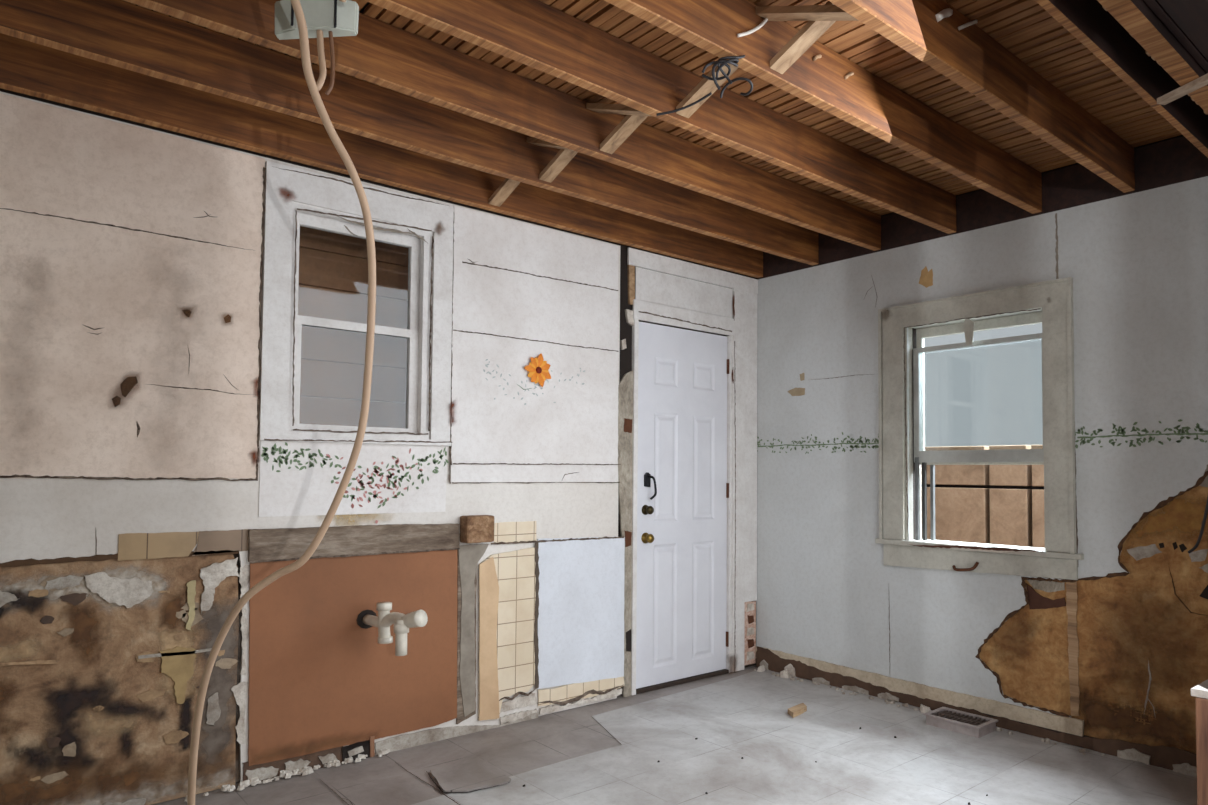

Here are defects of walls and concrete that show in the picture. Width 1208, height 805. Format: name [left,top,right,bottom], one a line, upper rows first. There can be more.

water stain [0,591,47,617]
peeling [0,553,153,608]
water stain [0,682,165,805]
water stain [67,605,100,657]
water stain [162,591,239,788]
flaking render [744,465,1208,777]